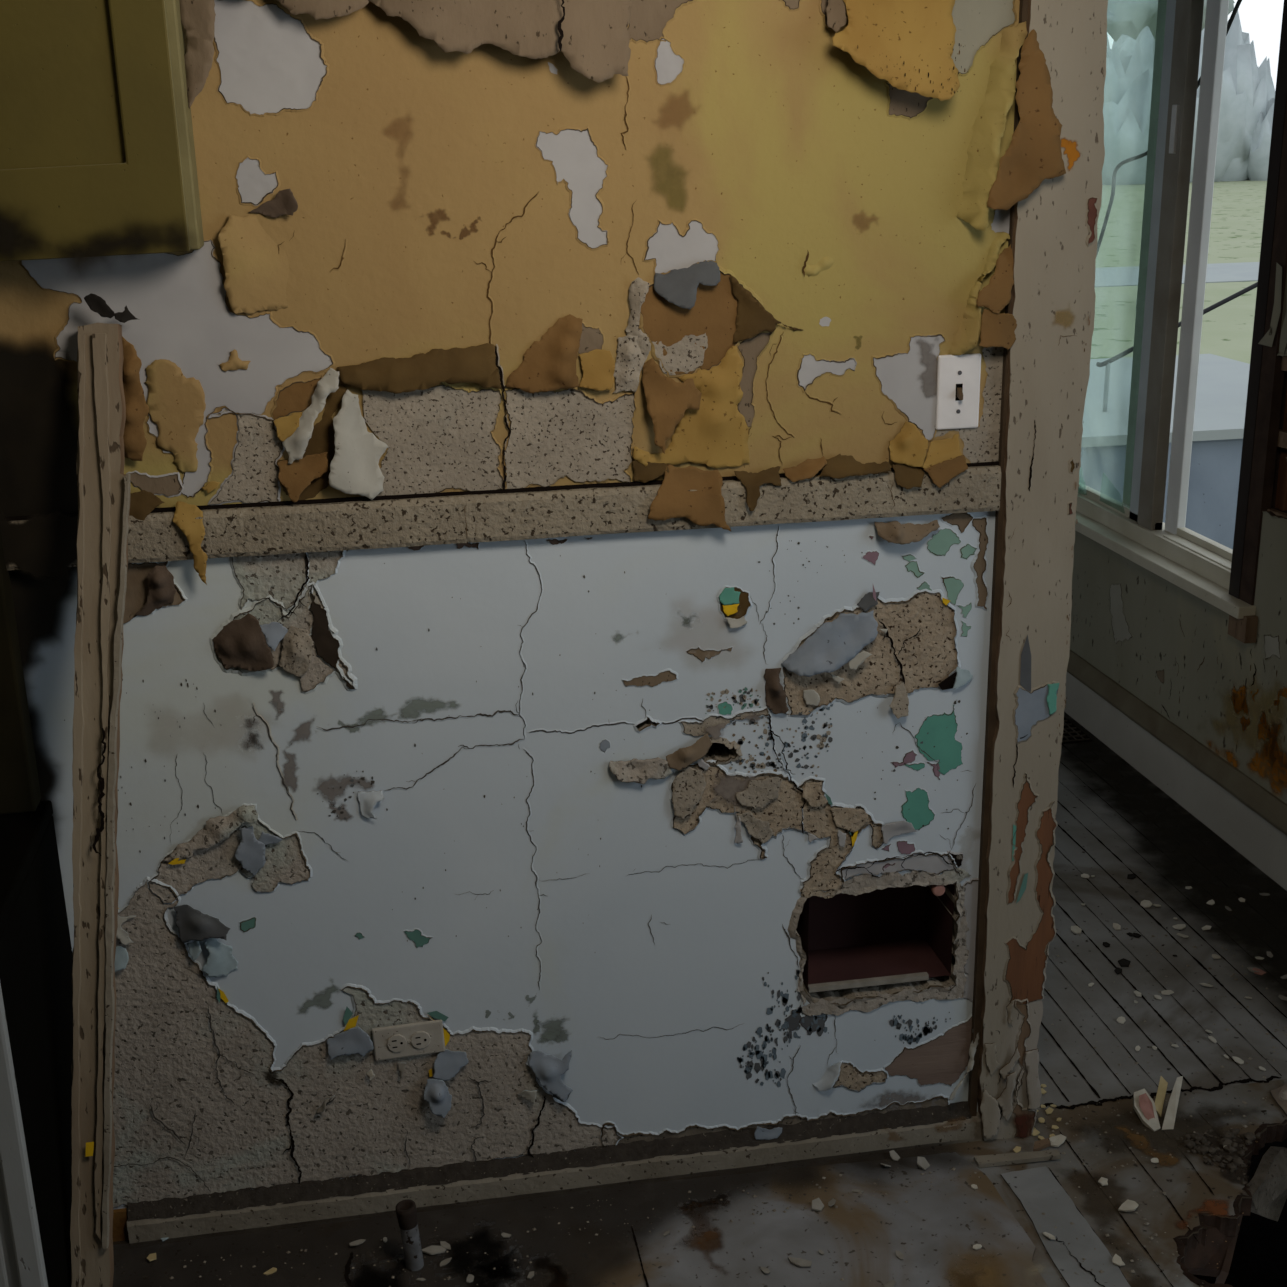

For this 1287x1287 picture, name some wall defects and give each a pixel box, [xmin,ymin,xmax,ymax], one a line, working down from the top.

peeling [213,0,330,117]
peeling [534,127,610,251]
peeling [20,156,335,500]
peeling [795,333,1004,463]
crack [277,552,309,622]
peeling [308,586,355,689]
crack [878,620,920,684]
crack [316,526,806,990]
flaking render [669,687,979,1002]
crack [836,723,976,878]
corrosion [1208,686,1287,795]
crack [208,1007,303,1184]